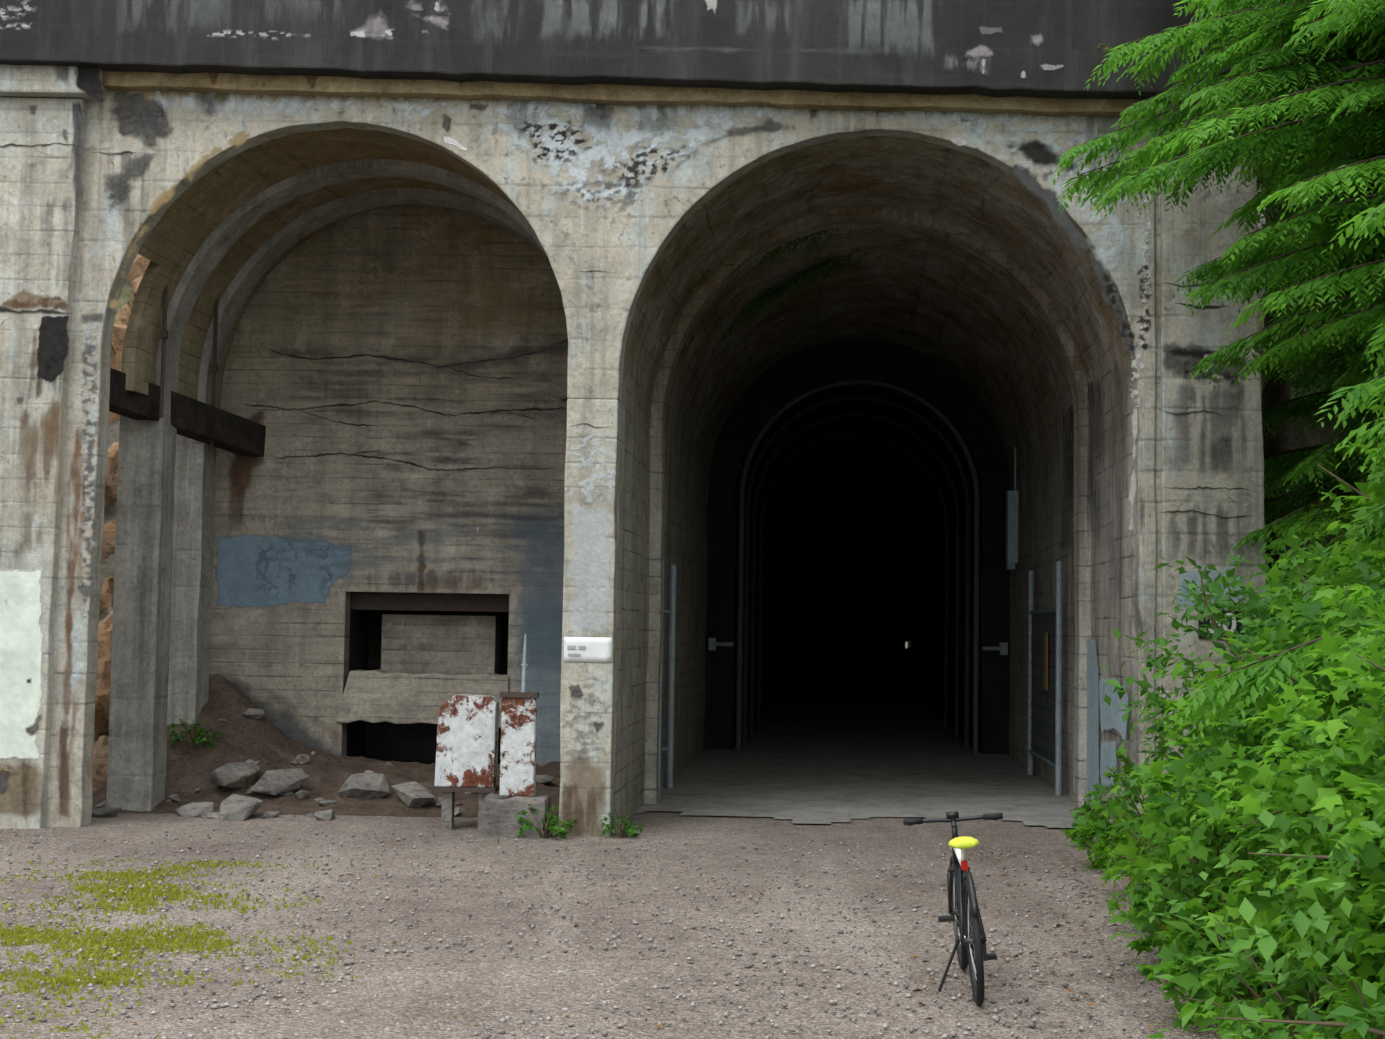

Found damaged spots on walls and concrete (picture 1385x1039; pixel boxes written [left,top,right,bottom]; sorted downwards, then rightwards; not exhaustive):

damp [149,91,257,113]
spalling [393,102,468,151]
peeling [472,101,764,202]
damp [122,188,173,275]
crack [245,339,612,471]
rust [22,402,85,782]